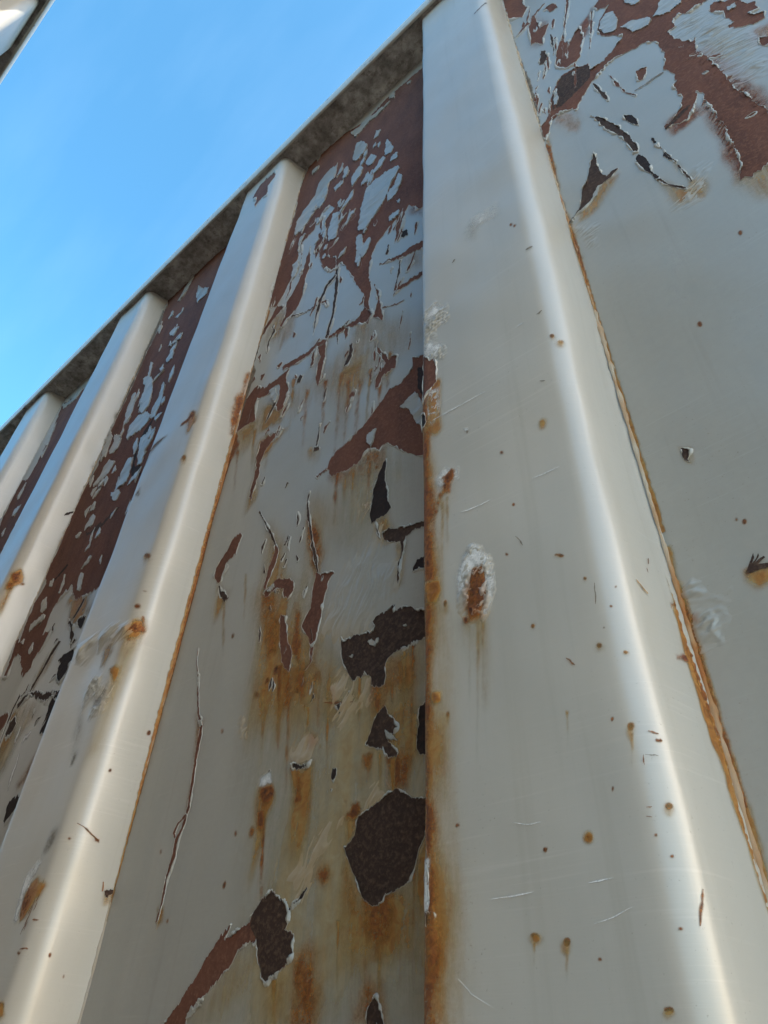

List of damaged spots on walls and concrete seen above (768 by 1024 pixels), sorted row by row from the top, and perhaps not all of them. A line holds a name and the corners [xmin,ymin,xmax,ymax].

peeling [569,152,618,224]
peeling [502,0,768,189]
peeling [3,793,20,827]
rust [13,862,45,934]
peeling [0,245,228,751]
rust [107,366,256,918]
peeling [231,67,441,703]
rust [221,403,497,1024]
rust [566,212,665,533]
rust [680,447,693,463]
rust [668,547,768,909]